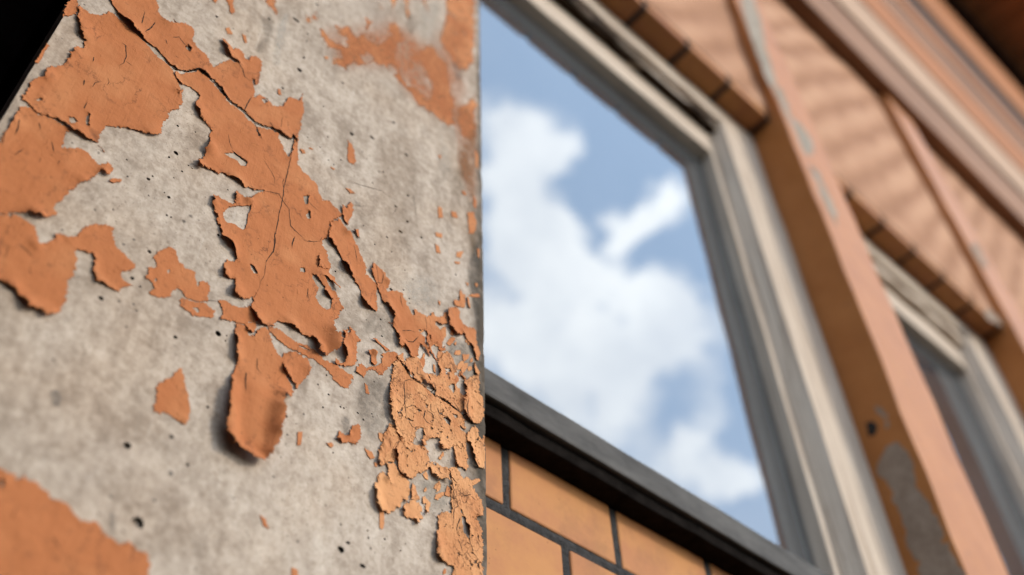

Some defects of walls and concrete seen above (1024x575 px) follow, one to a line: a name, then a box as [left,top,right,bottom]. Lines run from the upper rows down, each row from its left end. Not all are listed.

crack [83,12,320,296]
peeling [0,0,481,460]
peeling [0,468,151,575]